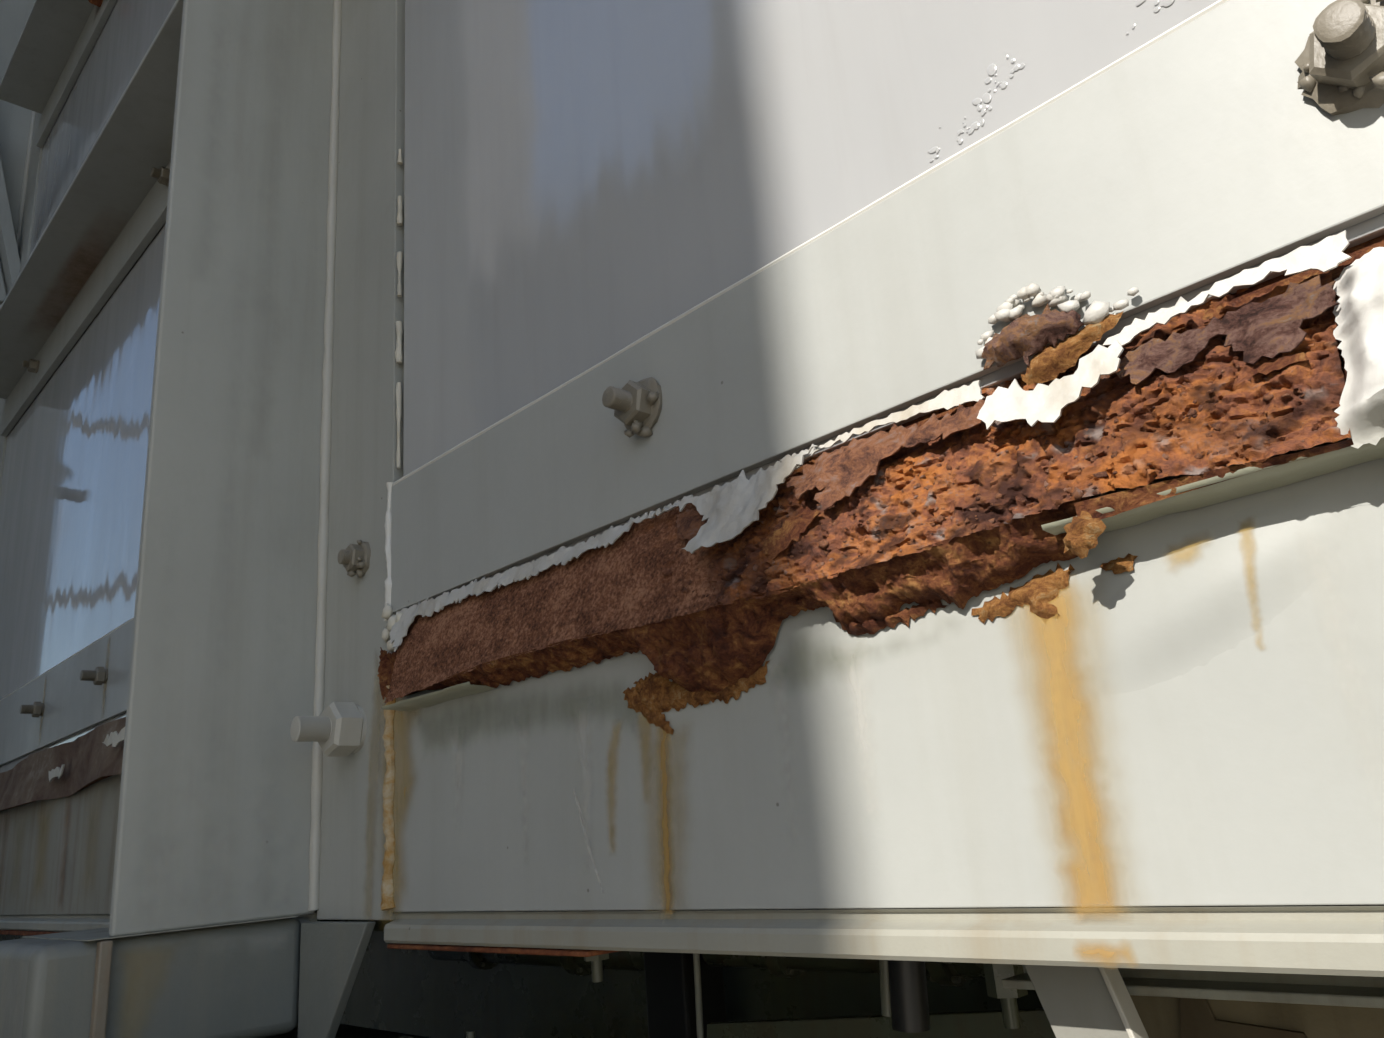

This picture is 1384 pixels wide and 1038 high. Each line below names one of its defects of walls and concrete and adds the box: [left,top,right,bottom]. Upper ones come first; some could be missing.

rust [380,269,1354,912]
peeling [389,230,1352,652]